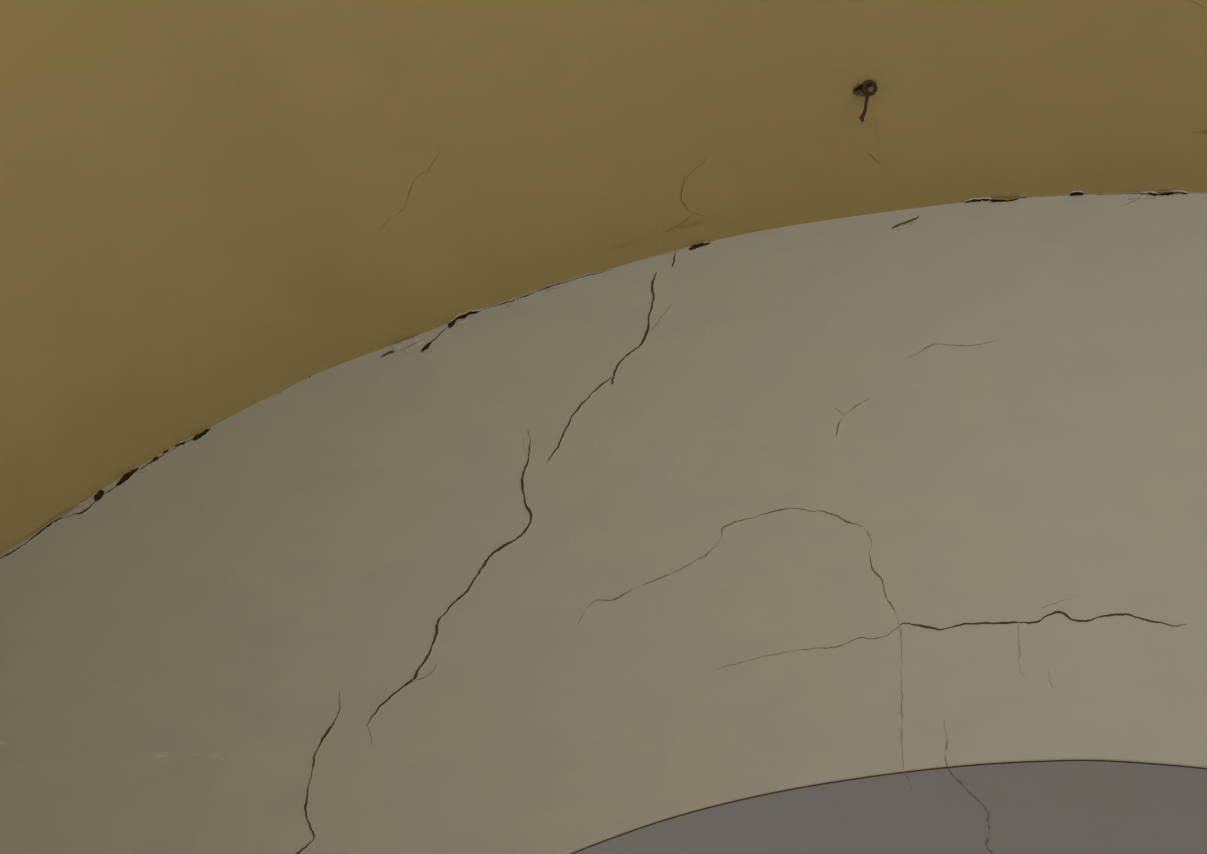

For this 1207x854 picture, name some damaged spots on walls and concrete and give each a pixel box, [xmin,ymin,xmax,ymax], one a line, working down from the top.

crack [294,147,709,854]
crack [577,507,1187,788]
crack [943,720,996,854]